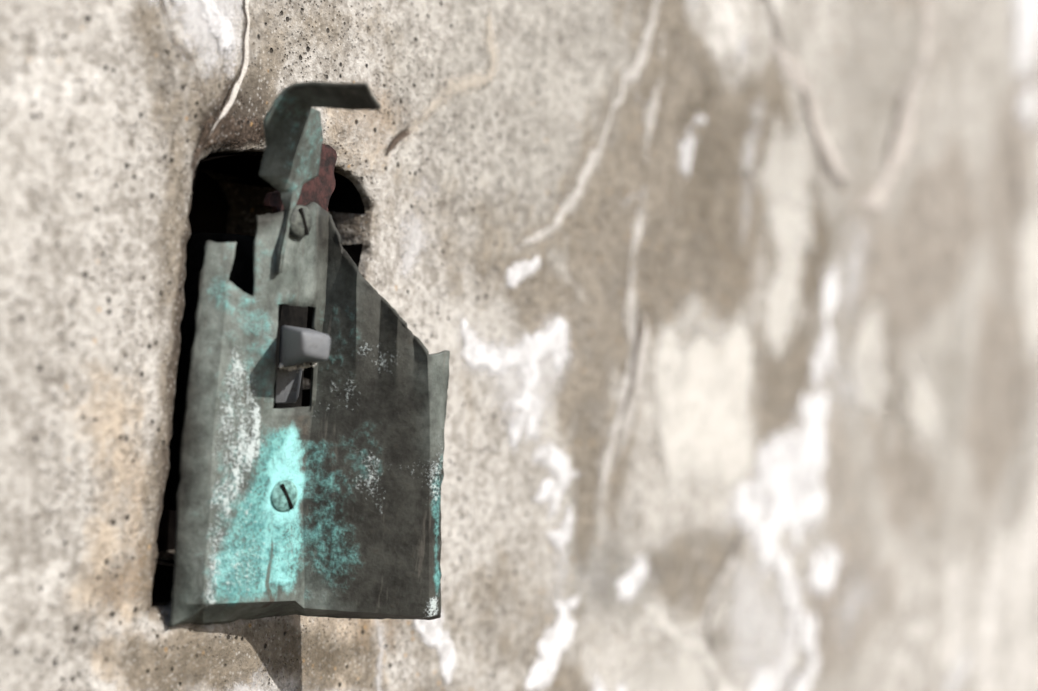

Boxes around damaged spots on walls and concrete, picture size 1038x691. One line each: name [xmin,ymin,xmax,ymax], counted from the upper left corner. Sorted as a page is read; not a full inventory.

crack [203,0,250,146]
efflorescence [505,256,541,289]
efflorescence [461,314,581,576]
efflorescence [414,610,456,684]
efflorescence [525,596,579,691]